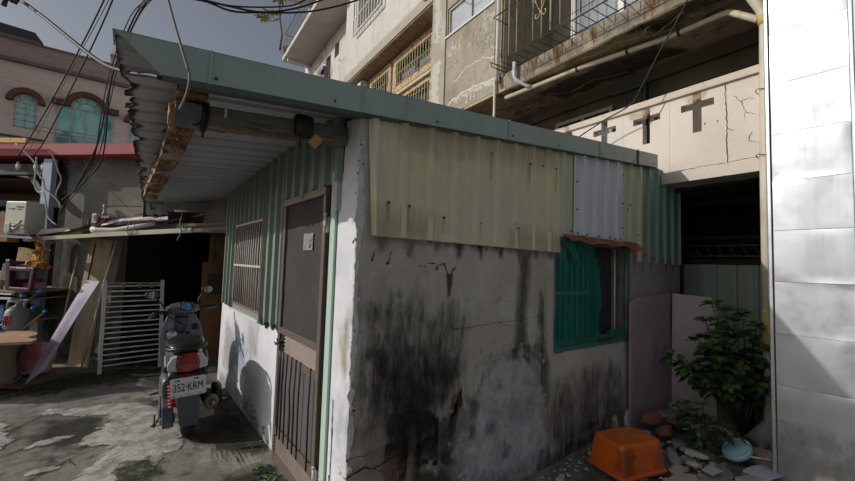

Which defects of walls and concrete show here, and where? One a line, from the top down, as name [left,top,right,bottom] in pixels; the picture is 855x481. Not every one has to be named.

crack [447,50,502,106]
crack [680,85,759,171]
corrosion [443,263,456,295]
water stain [516,251,531,357]
corrosion [563,234,645,252]
crack [328,400,409,481]
spalling [448,343,592,481]